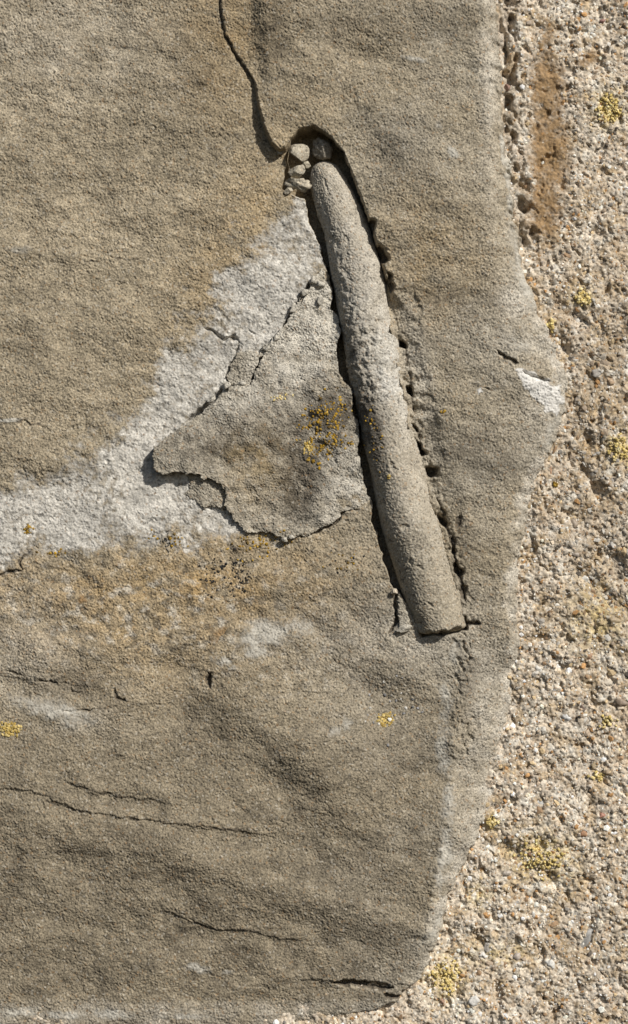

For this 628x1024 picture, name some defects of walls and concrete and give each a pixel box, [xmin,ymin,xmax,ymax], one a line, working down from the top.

crack [219,0,254,83]
peeling [0,197,373,570]
crack [302,509,356,537]
crack [47,785,143,821]
crack [334,980,400,999]